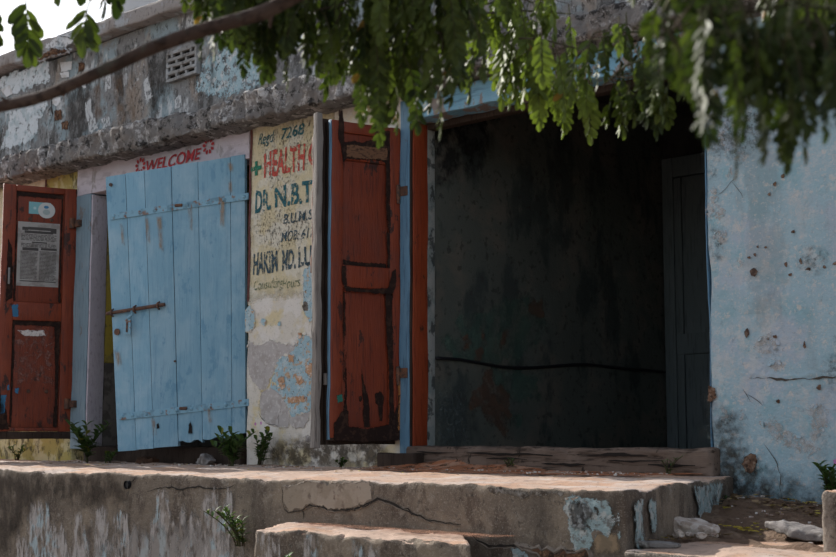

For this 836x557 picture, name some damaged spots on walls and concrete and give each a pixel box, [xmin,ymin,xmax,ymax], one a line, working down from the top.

peeling [0,30,85,98]
peeling [196,48,266,99]
peeling [0,95,69,151]
peeling [302,265,312,322]
peeling [245,305,312,443]
spalling [742,452,758,473]
crack [281,488,530,550]
peeling [487,486,621,557]